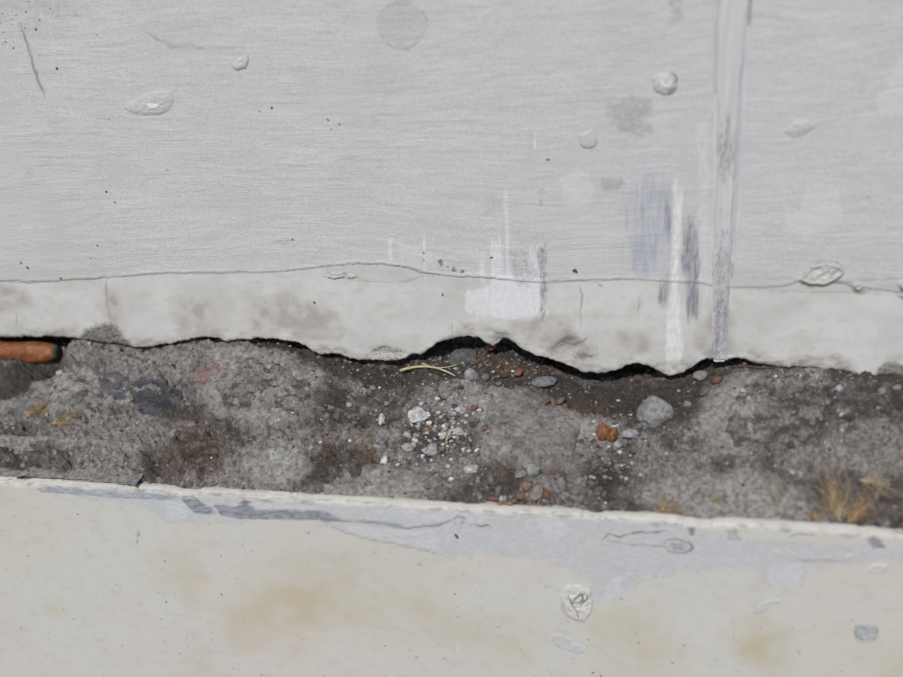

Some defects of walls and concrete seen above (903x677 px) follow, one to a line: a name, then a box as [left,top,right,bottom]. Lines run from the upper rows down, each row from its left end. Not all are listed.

damp [599,25,752,375]